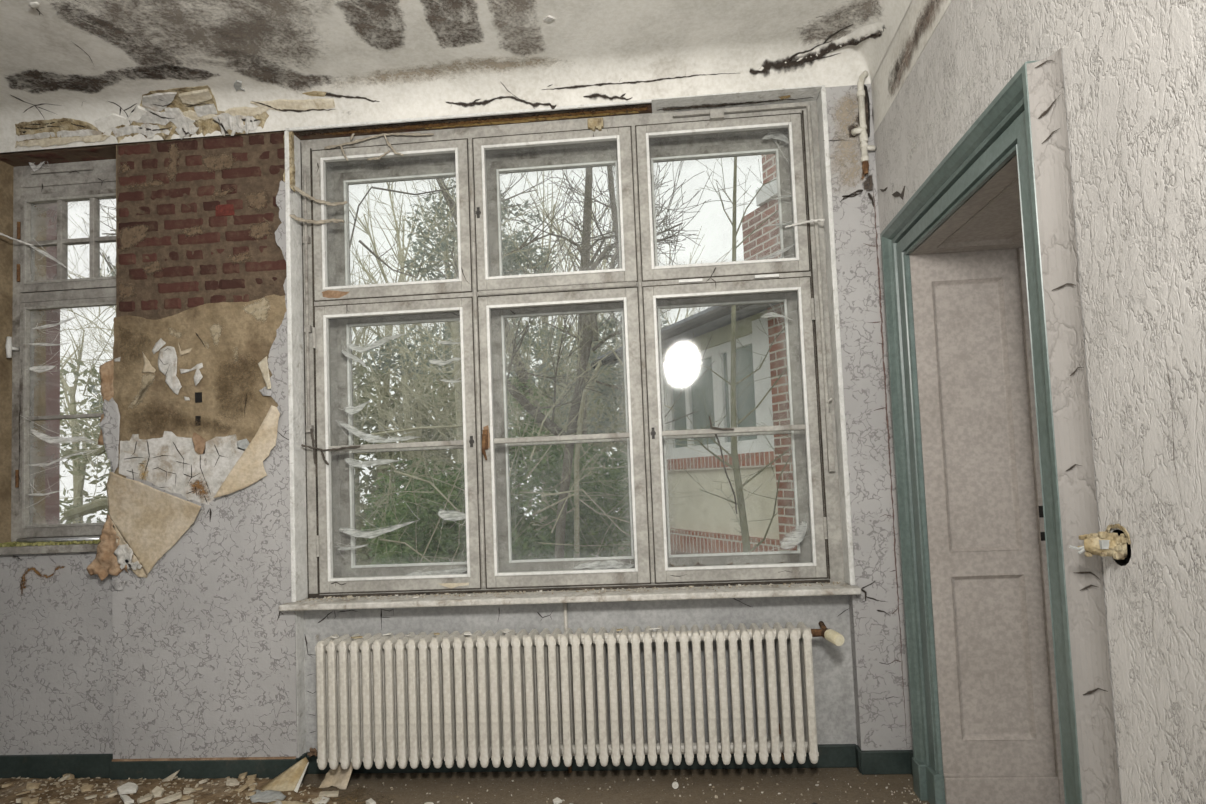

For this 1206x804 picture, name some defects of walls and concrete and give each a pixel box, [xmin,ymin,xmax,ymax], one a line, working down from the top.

water stain [6,0,331,94]
water stain [338,0,403,50]
water stain [368,0,544,81]
water stain [804,0,878,40]
water stain [889,0,940,94]
crack [446,73,735,109]
flaking render [112,89,295,505]
spalling [1069,524,1131,566]
rust [13,556,65,596]